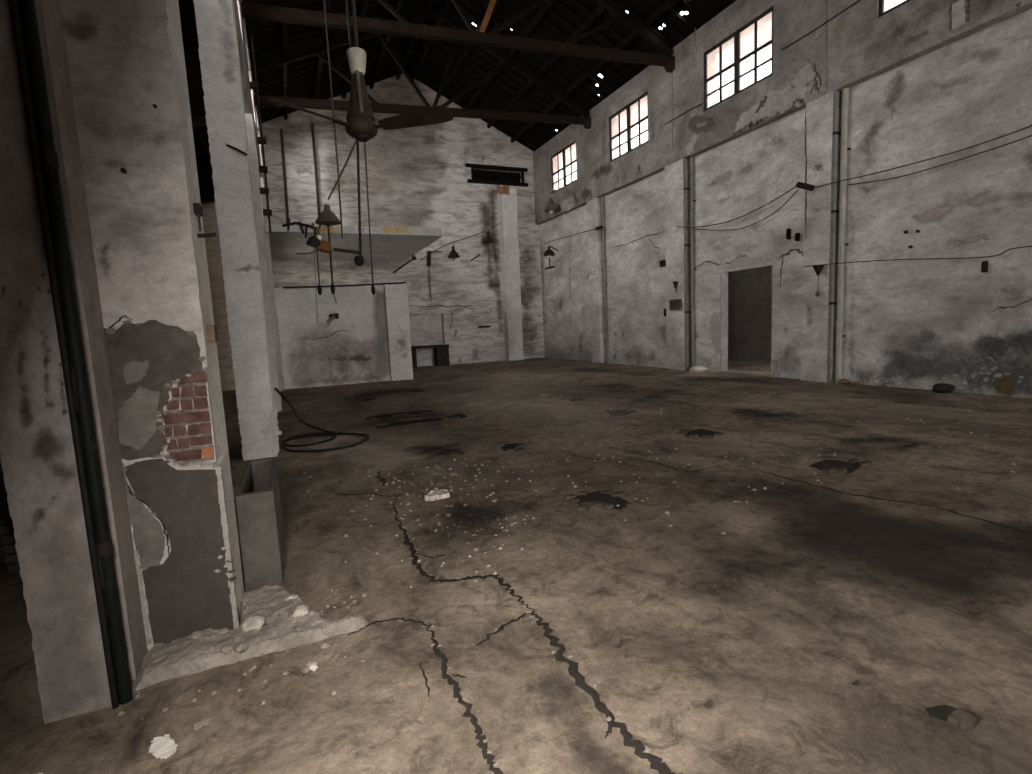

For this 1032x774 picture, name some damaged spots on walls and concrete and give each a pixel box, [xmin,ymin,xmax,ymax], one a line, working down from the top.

crack [990,298,1032,312]
leakage [860,331,1032,403]
flaking render [104,320,239,629]
spalling [260,404,282,452]
spalling [134,550,152,645]
crack [326,464,683,774]